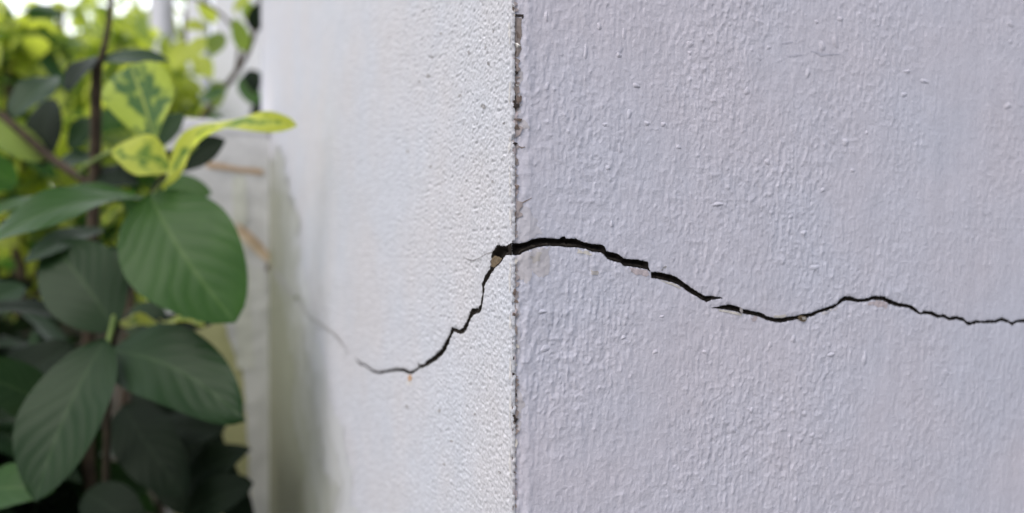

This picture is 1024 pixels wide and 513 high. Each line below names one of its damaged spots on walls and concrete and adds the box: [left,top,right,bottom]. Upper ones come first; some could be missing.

crack [273,237,1024,374]